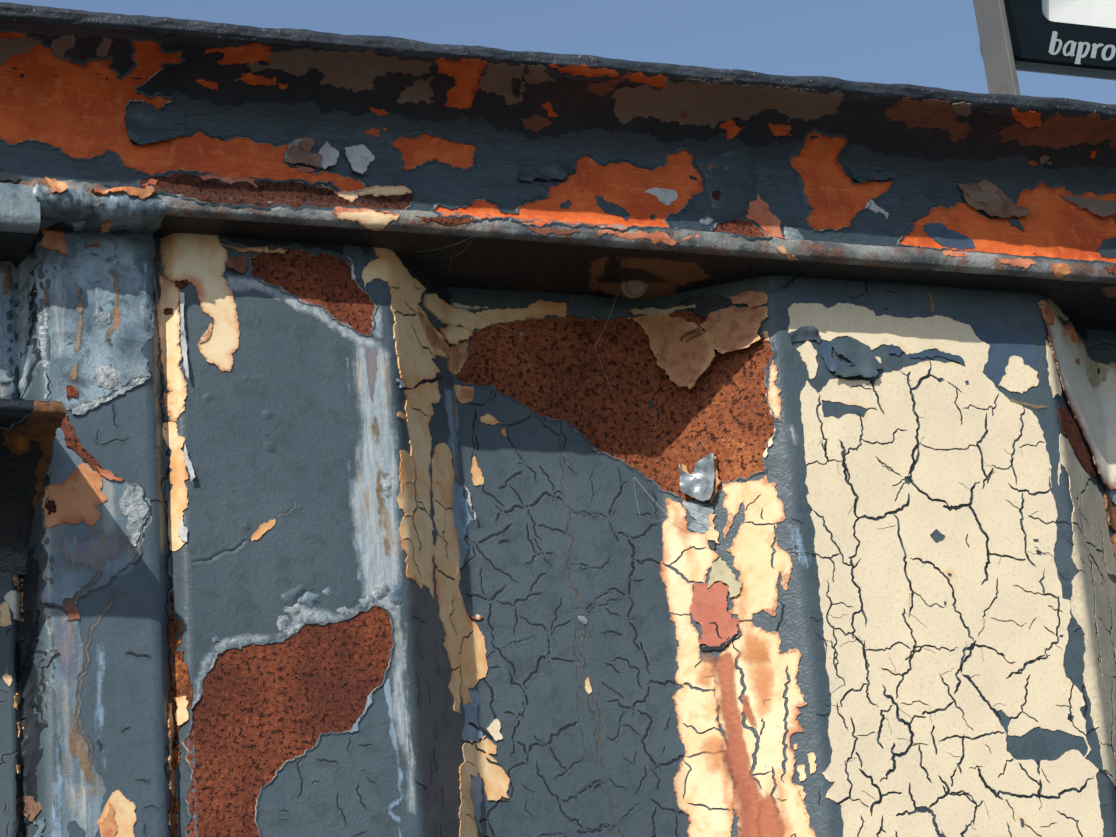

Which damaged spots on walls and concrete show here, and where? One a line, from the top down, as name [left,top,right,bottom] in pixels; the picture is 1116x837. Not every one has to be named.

peeling [0,28,478,199]
rust [220,243,381,346]
rust [136,172,483,226]
peeling [204,43,902,245]
rust [452,314,780,504]
rust [167,581,397,837]
peeling [0,221,795,837]
crack [413,654,446,837]
crack [460,385,692,837]
rust [701,637,787,837]
peeling [660,299,1116,837]
crack [772,359,1116,837]